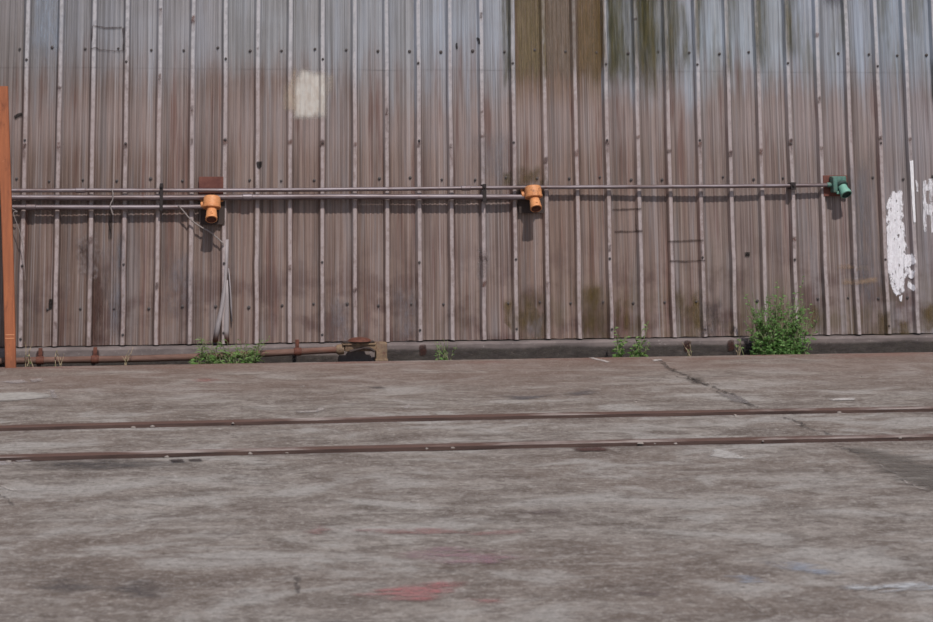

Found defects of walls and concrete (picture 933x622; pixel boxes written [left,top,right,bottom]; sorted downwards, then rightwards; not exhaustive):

water stain [506,0,616,77]
peeling [887,249,916,301]
crack [660,360,758,408]